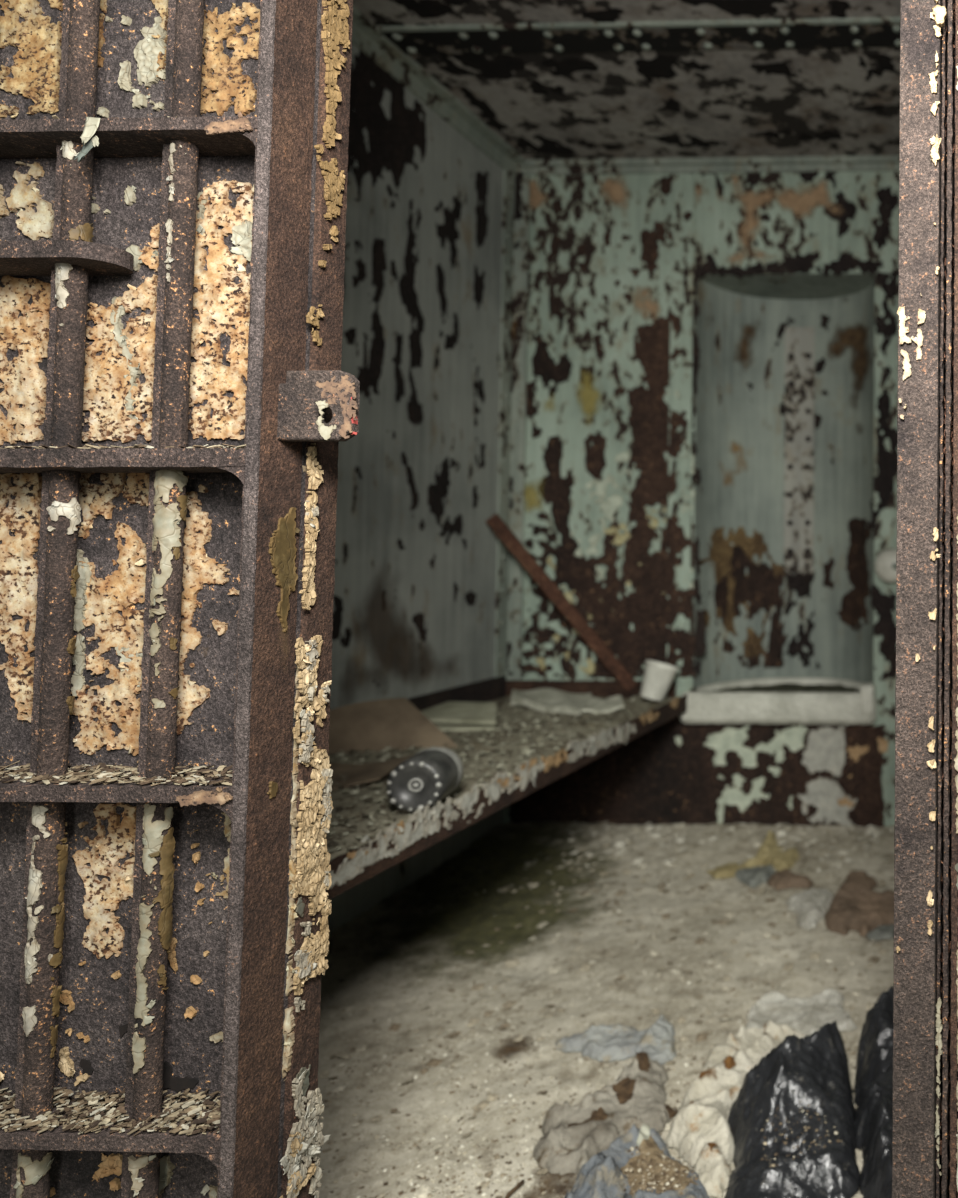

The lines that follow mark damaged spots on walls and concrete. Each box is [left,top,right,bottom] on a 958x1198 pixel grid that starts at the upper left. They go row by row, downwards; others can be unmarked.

peeling [0,0,63,118]
peeling [98,0,169,111]
peeling [200,2,260,135]
peeling [0,263,73,446]
peeling [82,219,175,443]
peeling [188,180,254,441]
corrosion [315,375,358,439]
peeling [314,0,489,468]
peeling [507,171,926,681]
peeling [0,469,239,763]
peeling [22,787,233,1086]
peeling [269,443,889,1198]